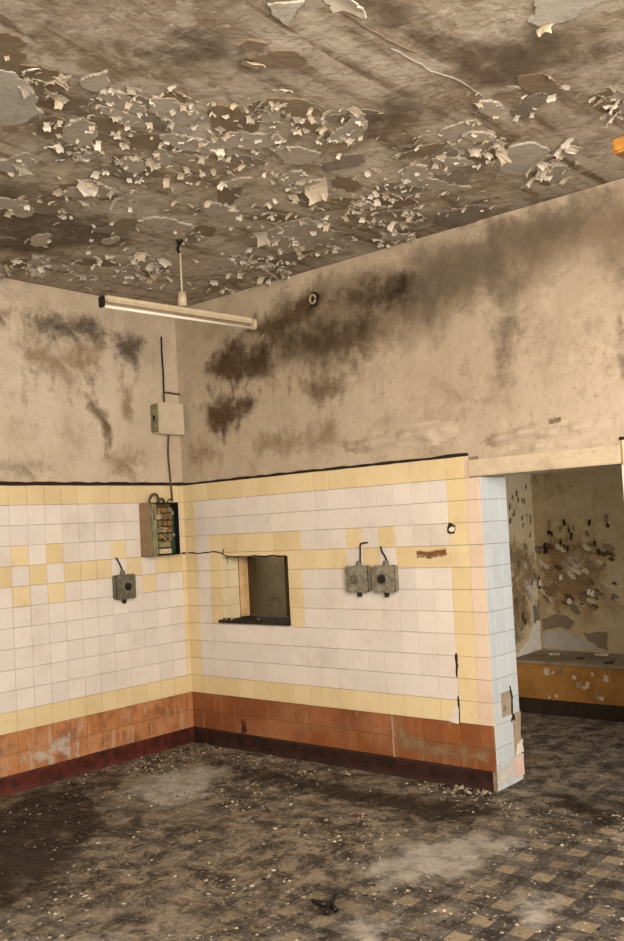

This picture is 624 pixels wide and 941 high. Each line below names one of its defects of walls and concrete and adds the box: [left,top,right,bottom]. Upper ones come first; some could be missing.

peeling [324,0,366,18]
peeling [536,23,553,37]
peeling [0,31,624,295]